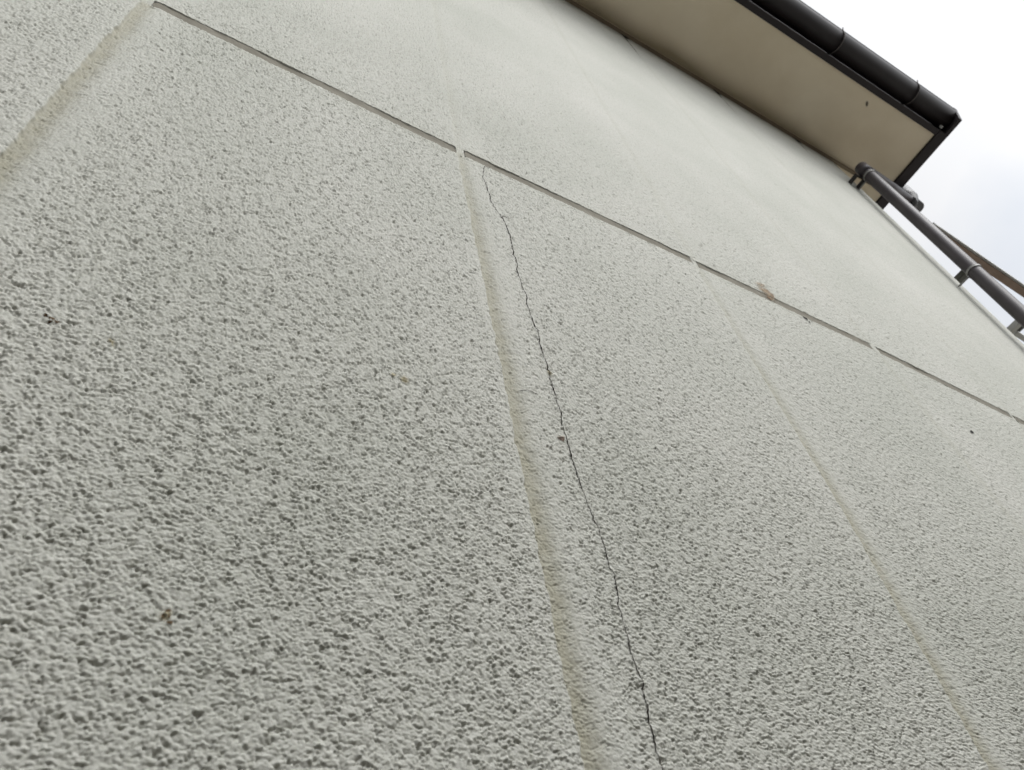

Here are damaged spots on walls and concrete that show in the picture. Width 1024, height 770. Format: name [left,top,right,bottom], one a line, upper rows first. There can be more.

crack [482,166,663,769]